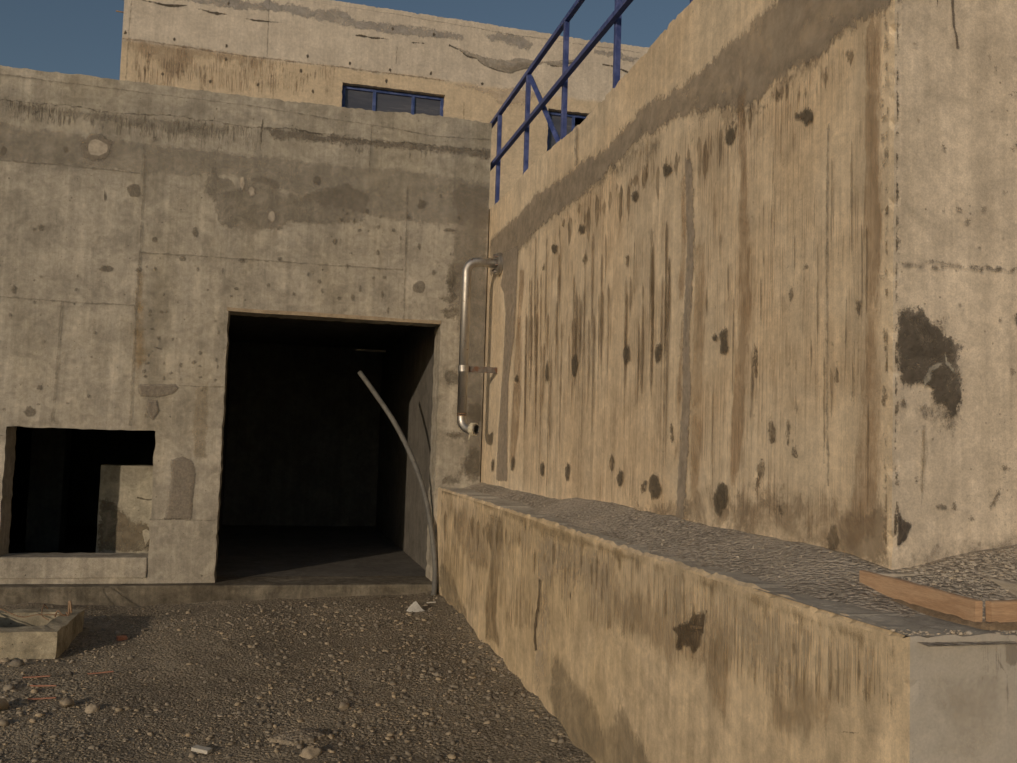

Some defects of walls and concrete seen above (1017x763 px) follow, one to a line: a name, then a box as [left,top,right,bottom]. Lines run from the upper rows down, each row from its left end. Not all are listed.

water stain [192,0,463,40]
water stain [454,0,890,519]